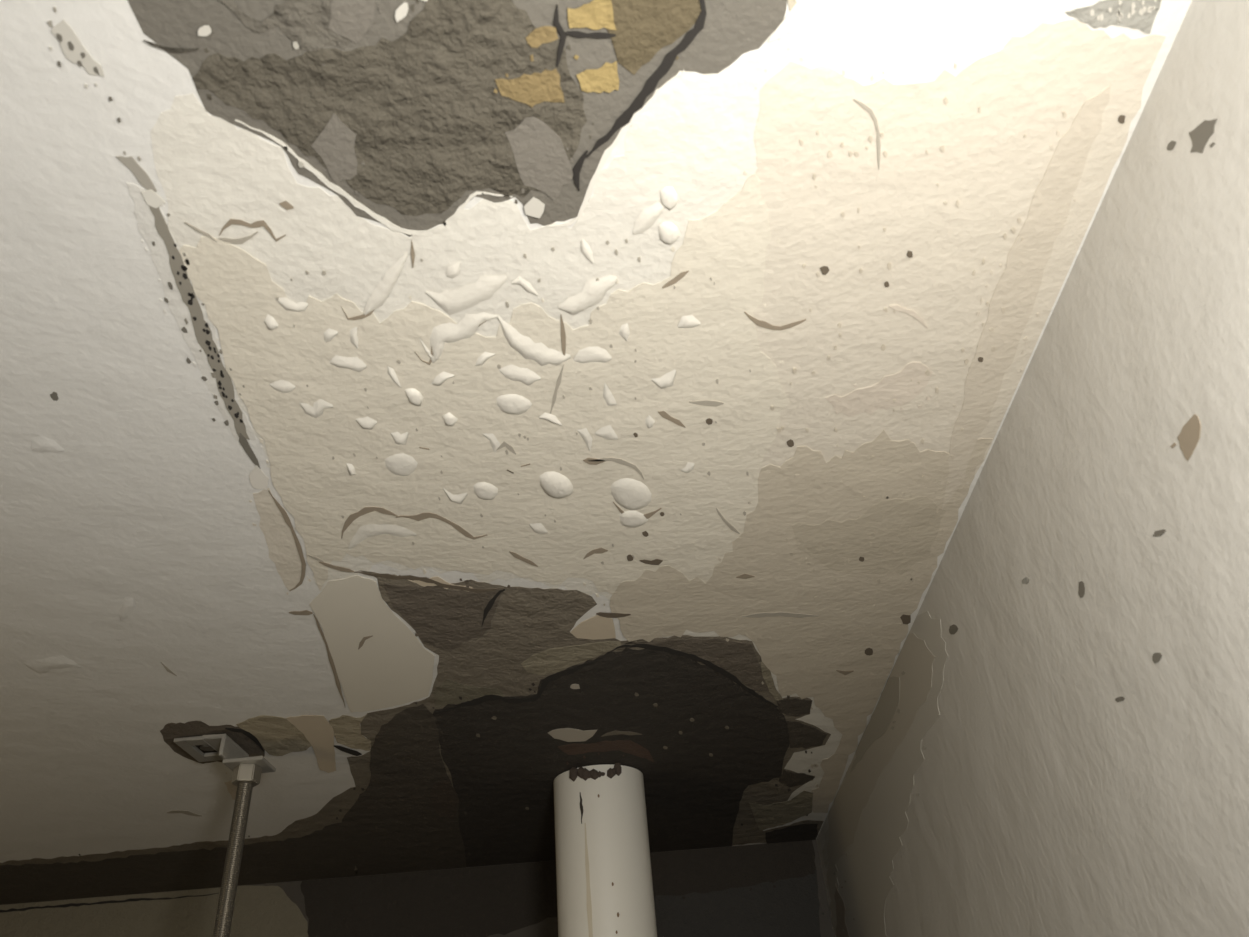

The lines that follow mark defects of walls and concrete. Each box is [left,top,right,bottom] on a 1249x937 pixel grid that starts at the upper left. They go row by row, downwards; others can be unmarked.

water stain [47,7,104,89]
water stain [116,151,157,192]
flaking render [128,0,813,237]
water stain [127,183,260,468]
water stain [149,19,1166,937]
water stain [0,847,227,905]